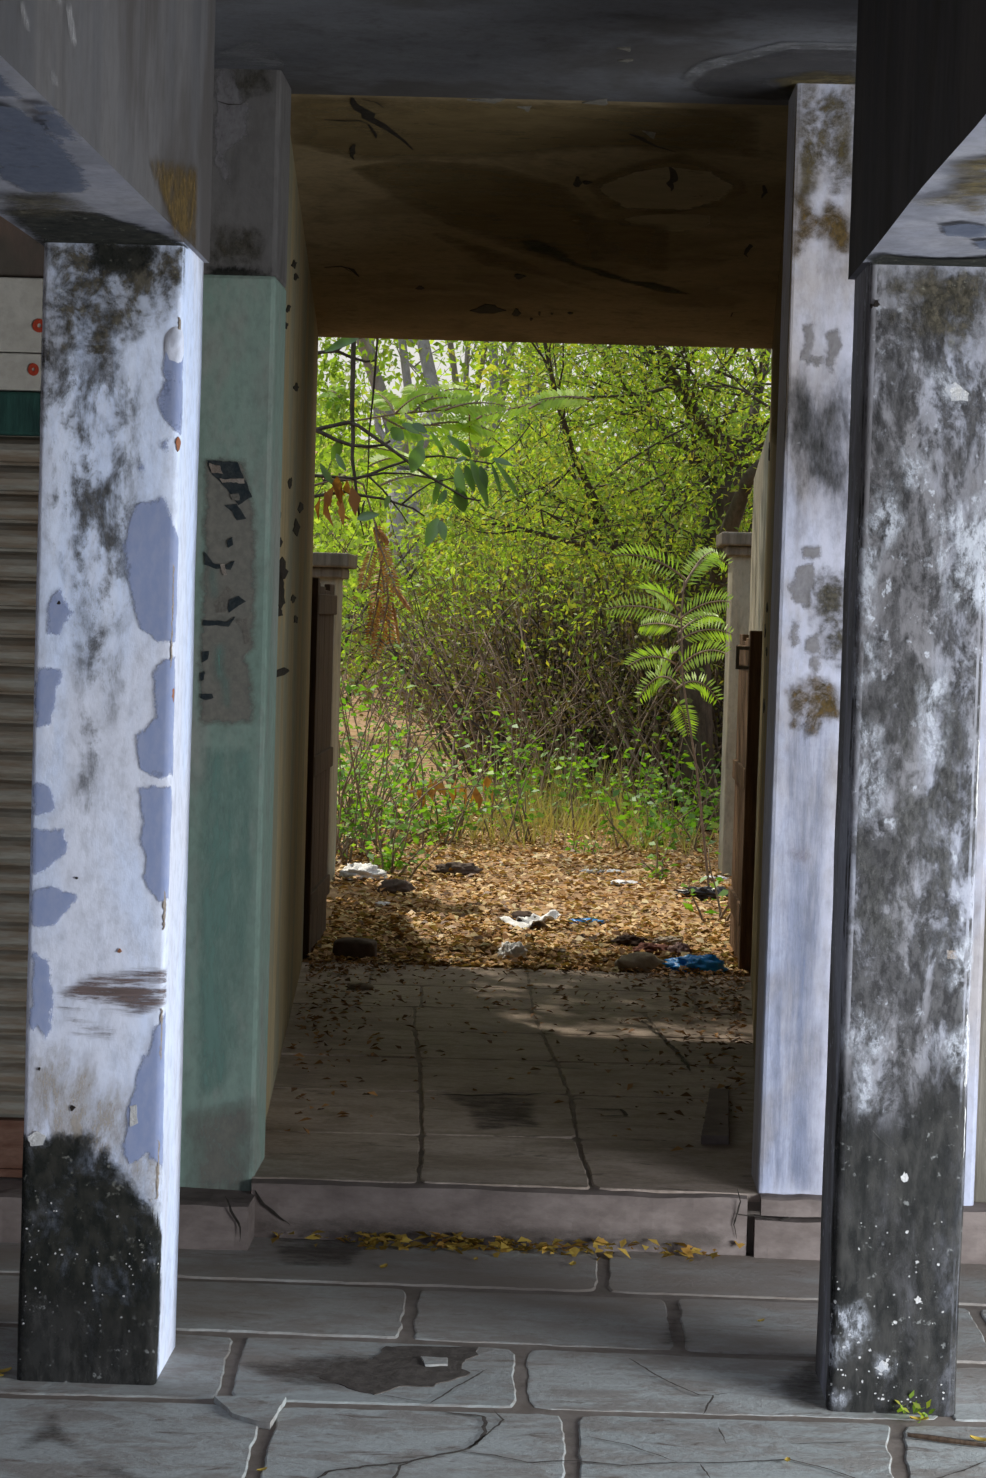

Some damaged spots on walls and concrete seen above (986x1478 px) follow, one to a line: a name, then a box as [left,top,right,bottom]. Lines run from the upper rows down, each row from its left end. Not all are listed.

peeling [47,589,73,635]
peeling [34,668,62,727]
leakage [295,43,986,1417]
peeling [31,782,78,928]
peeling [29,952,54,1039]
peeling [28,1131,46,1146]
peeling [123,1009,166,1199]
leakage [17,1064,162,1385]
crack [317,1358,855,1478]